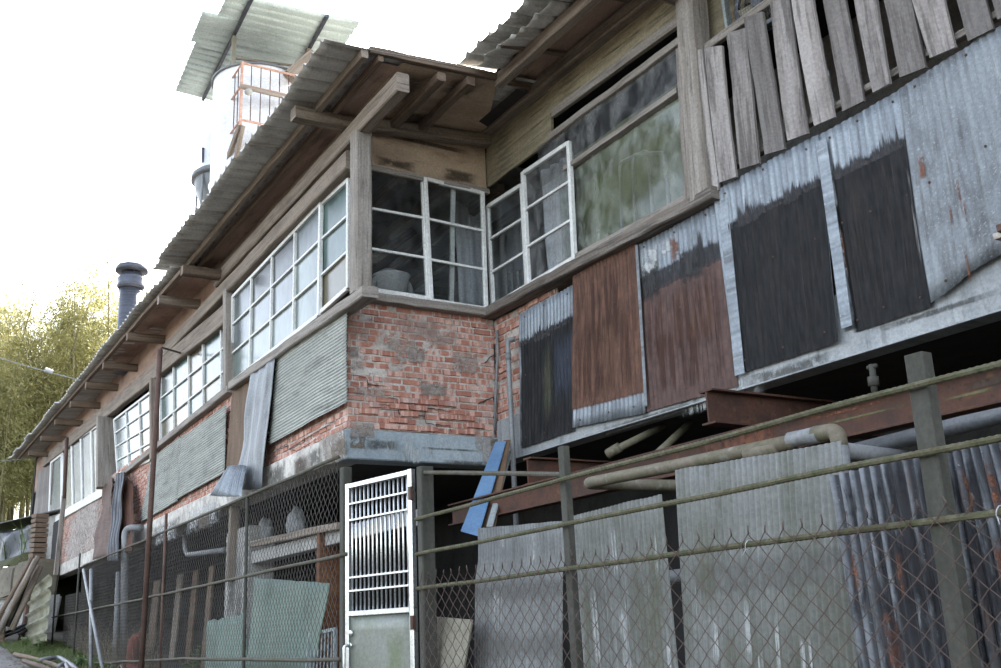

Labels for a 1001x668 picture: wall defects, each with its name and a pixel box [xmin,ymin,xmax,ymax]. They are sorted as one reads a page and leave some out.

corrosion [572,243,738,412]
corrosion [702,427,774,453]